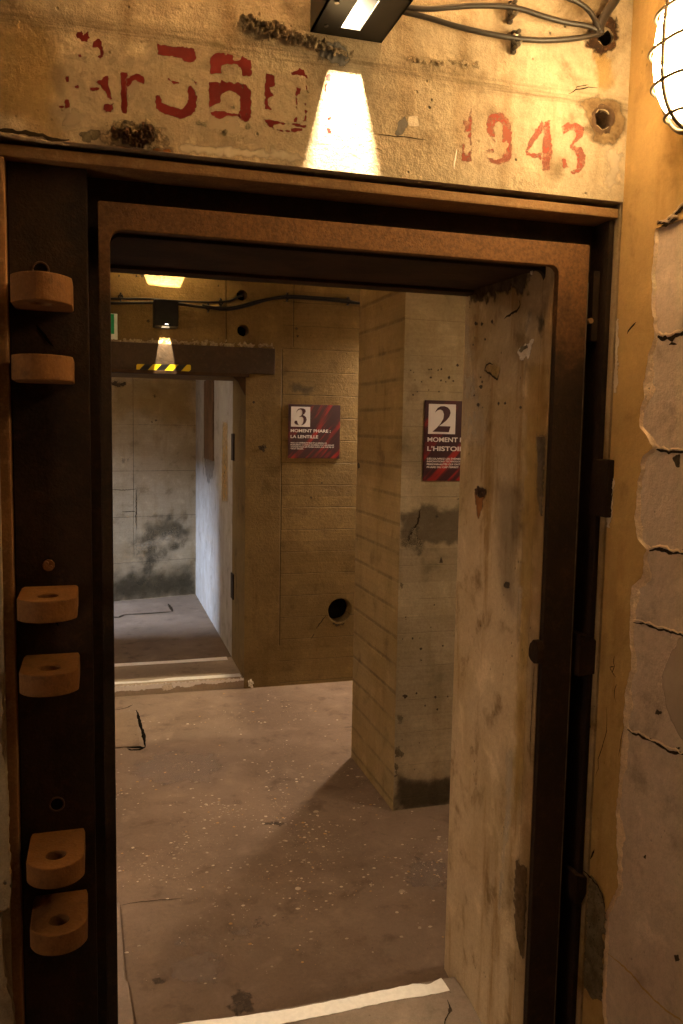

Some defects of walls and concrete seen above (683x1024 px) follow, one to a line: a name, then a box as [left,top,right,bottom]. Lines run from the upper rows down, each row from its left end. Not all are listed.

spalling [238,12,354,61]
spalling [100,118,172,153]
water stain [400,506,459,555]
flaking render [582,0,683,1024]
water stain [114,515,195,601]
water stain [397,778,450,809]